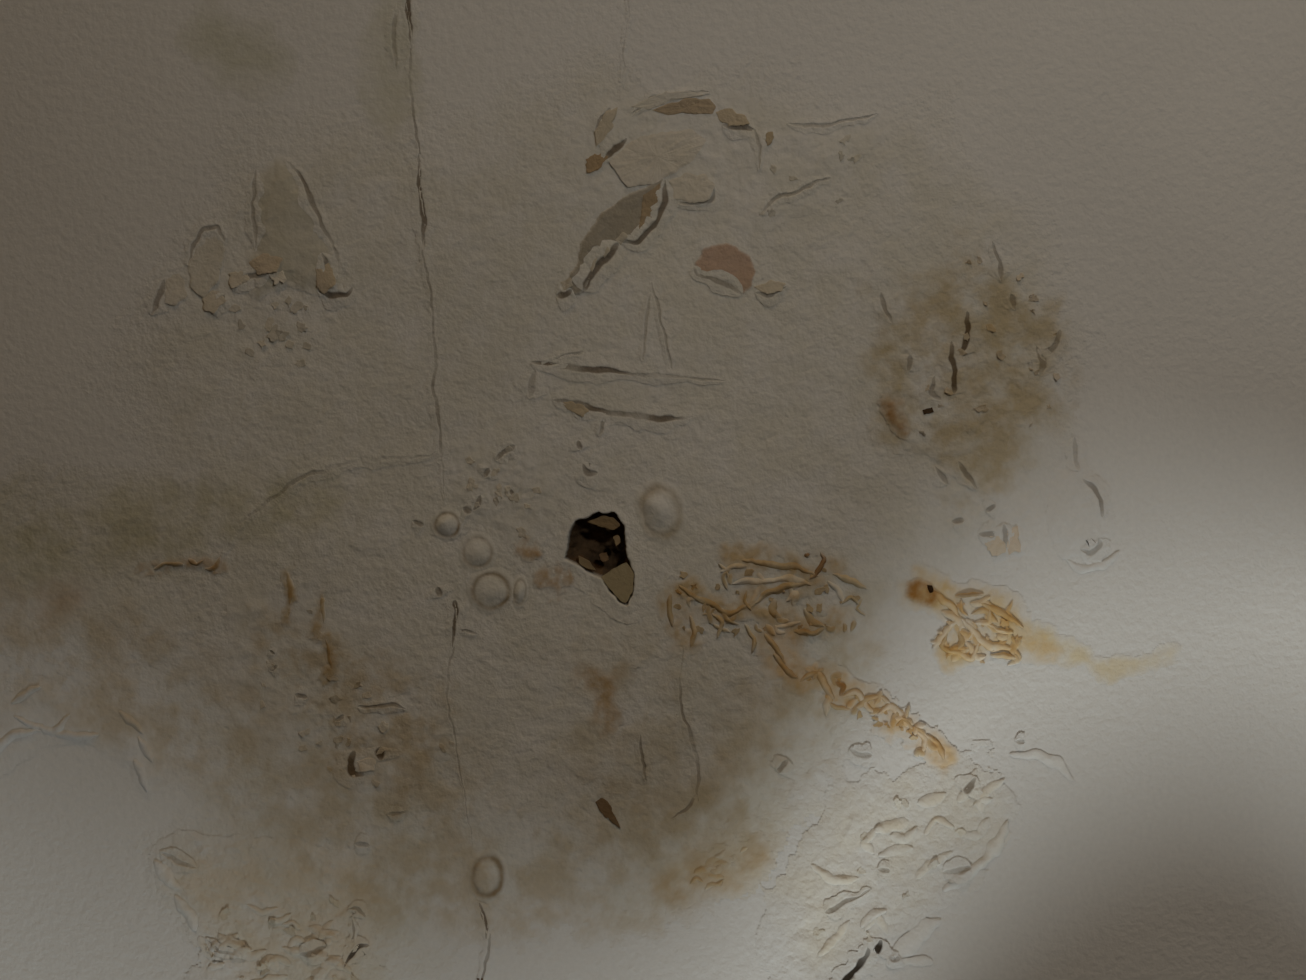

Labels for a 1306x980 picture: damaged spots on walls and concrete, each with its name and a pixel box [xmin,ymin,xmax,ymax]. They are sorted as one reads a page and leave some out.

water stain [174,0,299,104]
peeling [143,156,357,368]
flaking render [556,179,680,311]
flaking render [690,242,787,307]
water stain [419,42,1111,730]
water stain [0,101,876,980]
peeling [601,562,634,603]
corrosion [654,536,961,767]
corrosion [896,564,1183,686]
peeling [755,733,1074,980]
crack [474,902,496,980]